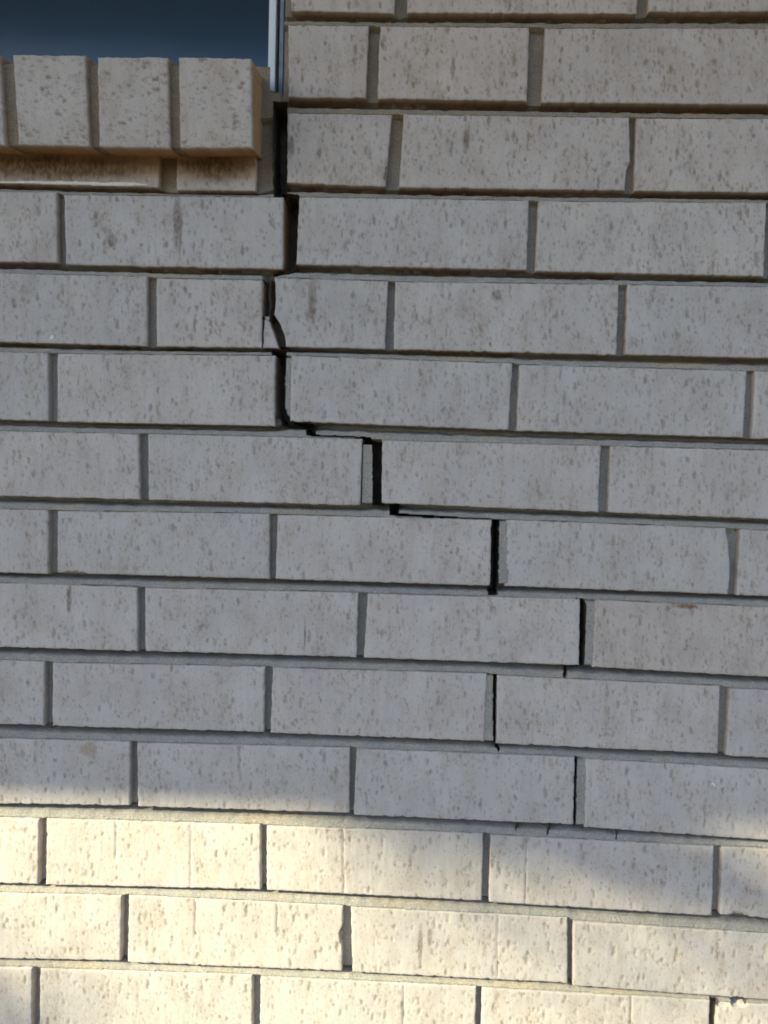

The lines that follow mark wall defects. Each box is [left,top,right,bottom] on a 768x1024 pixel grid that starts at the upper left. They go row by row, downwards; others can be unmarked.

crack [272,101,300,279]
crack [262,314,458,518]
crack [485,518,500,595]
crack [560,598,586,677]